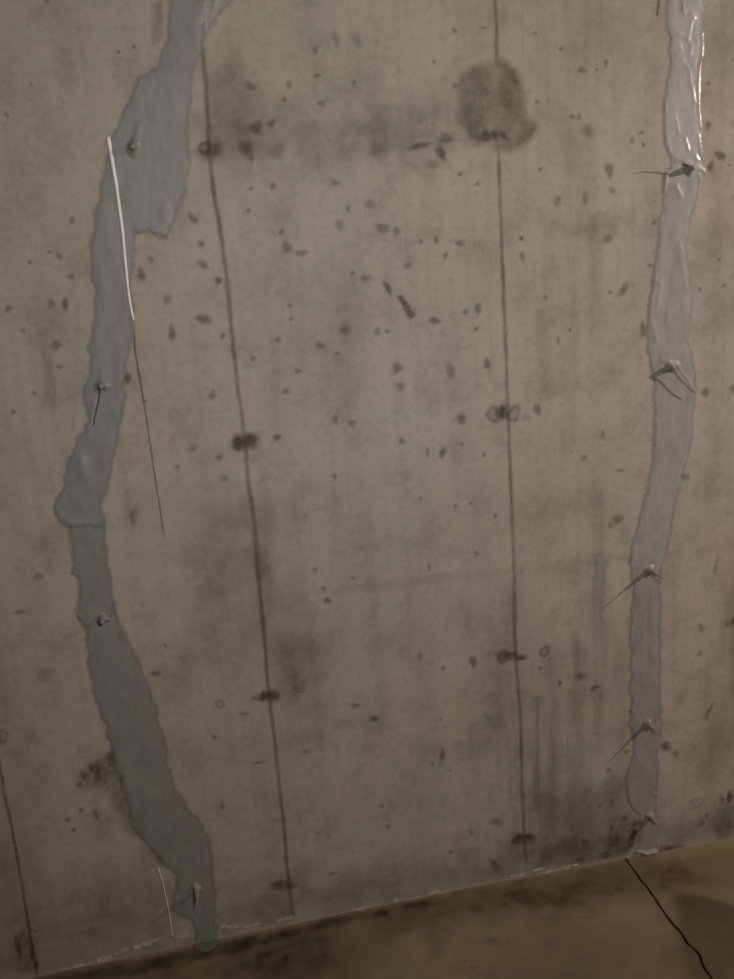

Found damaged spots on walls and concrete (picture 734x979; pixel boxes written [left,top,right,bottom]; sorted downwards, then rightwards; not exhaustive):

crack [55,0,230,952]
crack [625,0,713,979]